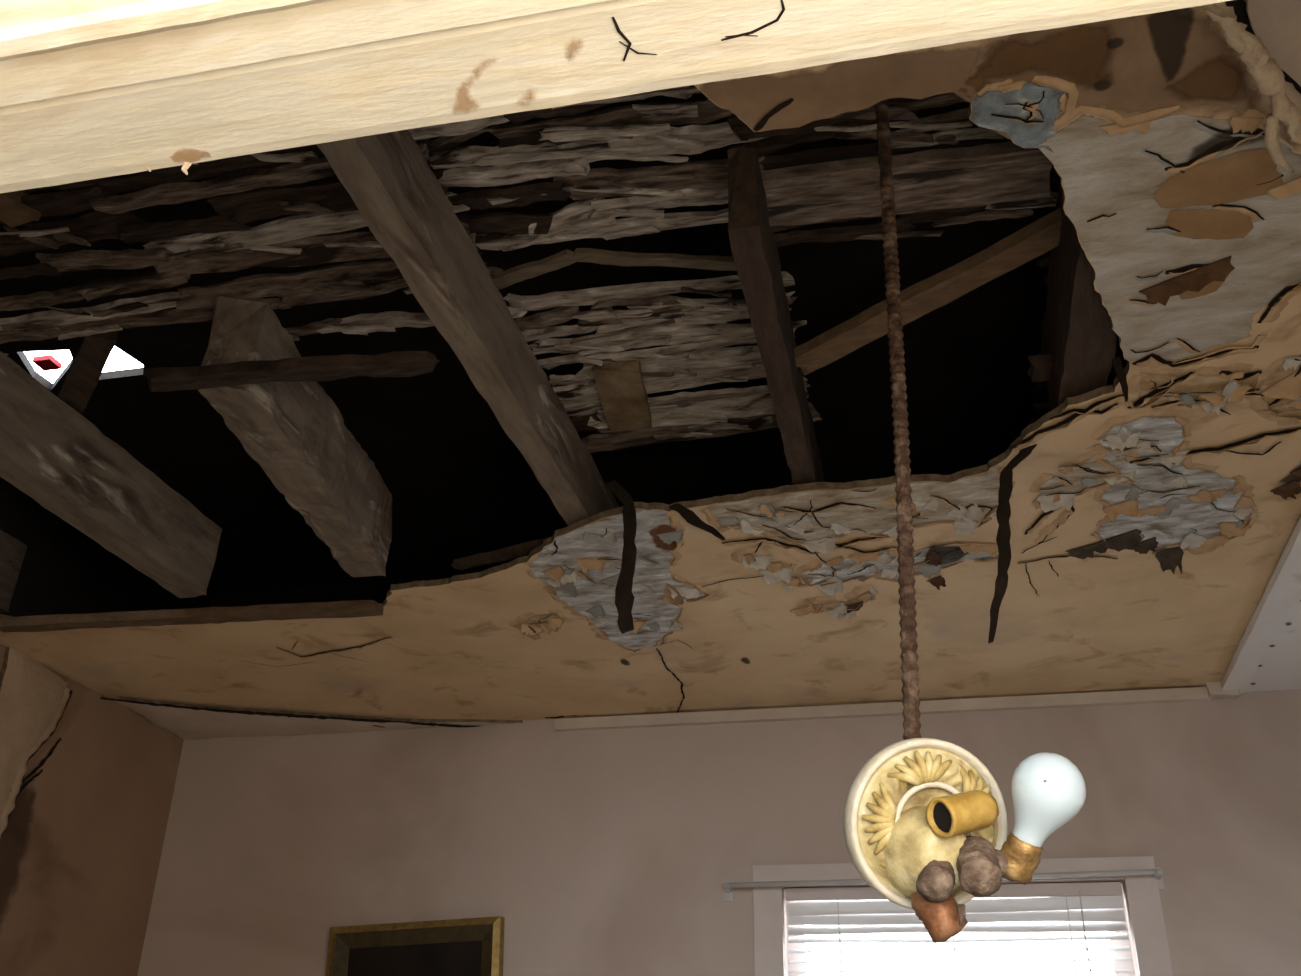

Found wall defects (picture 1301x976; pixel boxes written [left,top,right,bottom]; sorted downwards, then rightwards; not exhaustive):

crack [612,17,657,61]
crack [721,0,785,41]
peeling [1148,8,1193,80]
peeling [172,150,210,175]
peeling [699,76,1301,620]
peeling [508,510,715,665]
crack [244,637,394,667]
crack [0,688,482,841]